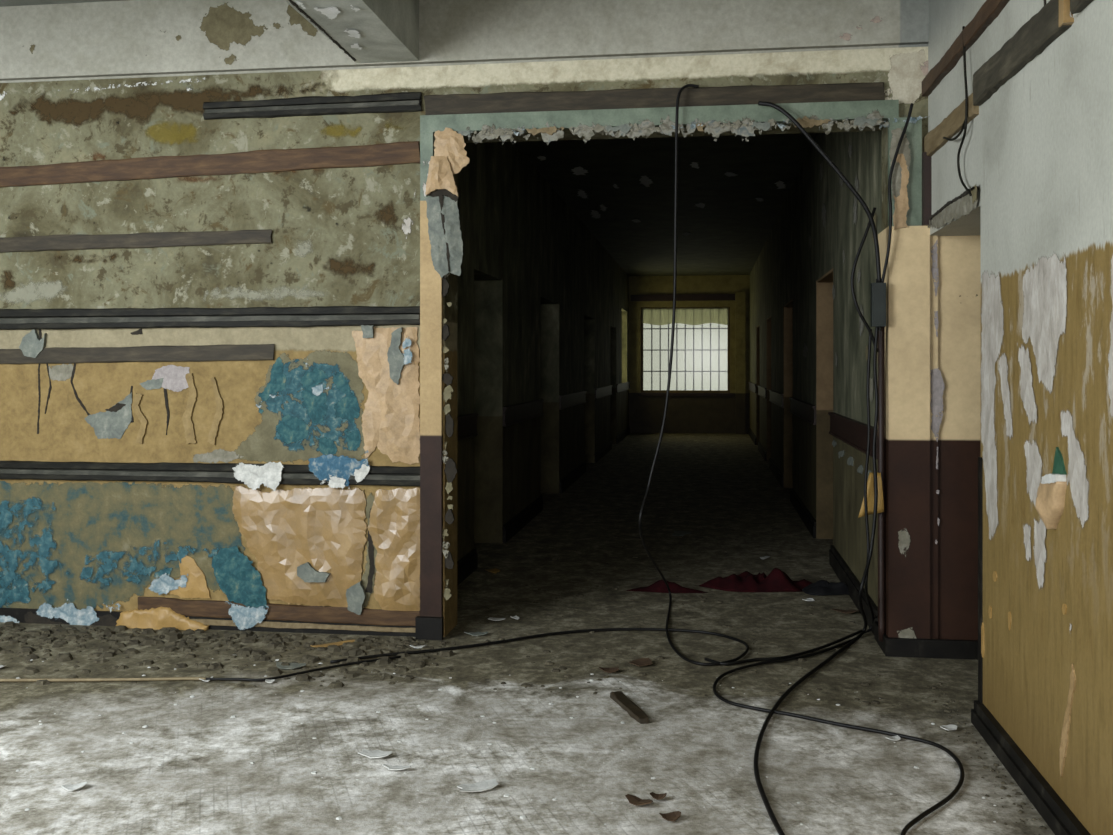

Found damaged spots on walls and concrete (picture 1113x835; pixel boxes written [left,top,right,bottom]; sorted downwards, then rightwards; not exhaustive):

leakage [9,84,319,145]
peeling [402,217,413,239]
peeling [19,329,47,358]
peeling [361,325,374,338]
peeling [387,327,412,385]
peeling [414,50,928,600]
peeling [976,252,1089,590]
peeling [0,350,370,631]
spalling [365,493,374,526]
peeling [346,542,377,615]
peeling [897,627,916,638]
peeling [981,606,992,658]